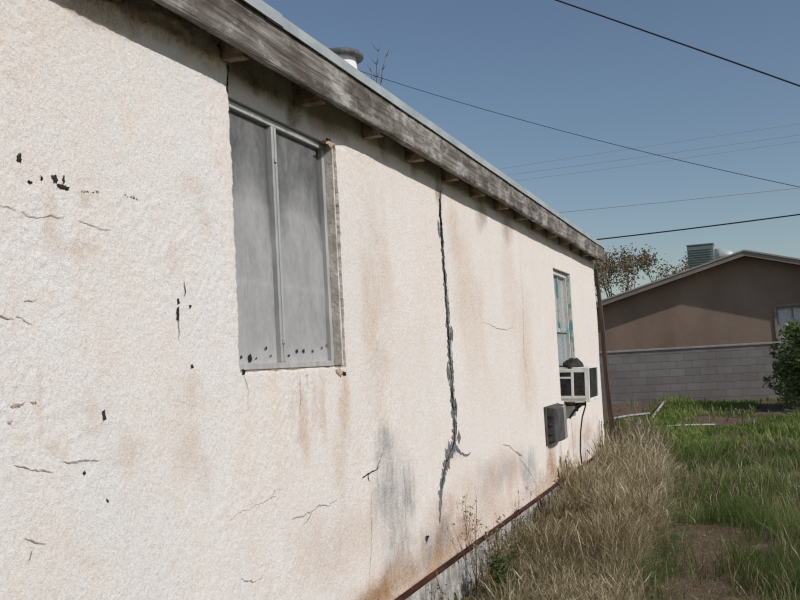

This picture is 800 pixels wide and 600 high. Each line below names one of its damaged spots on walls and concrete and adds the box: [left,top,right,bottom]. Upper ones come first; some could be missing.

peeling [28,175,70,190]
crack [0,205,109,230]
crack [438,191,471,529]
crack [292,499,337,523]